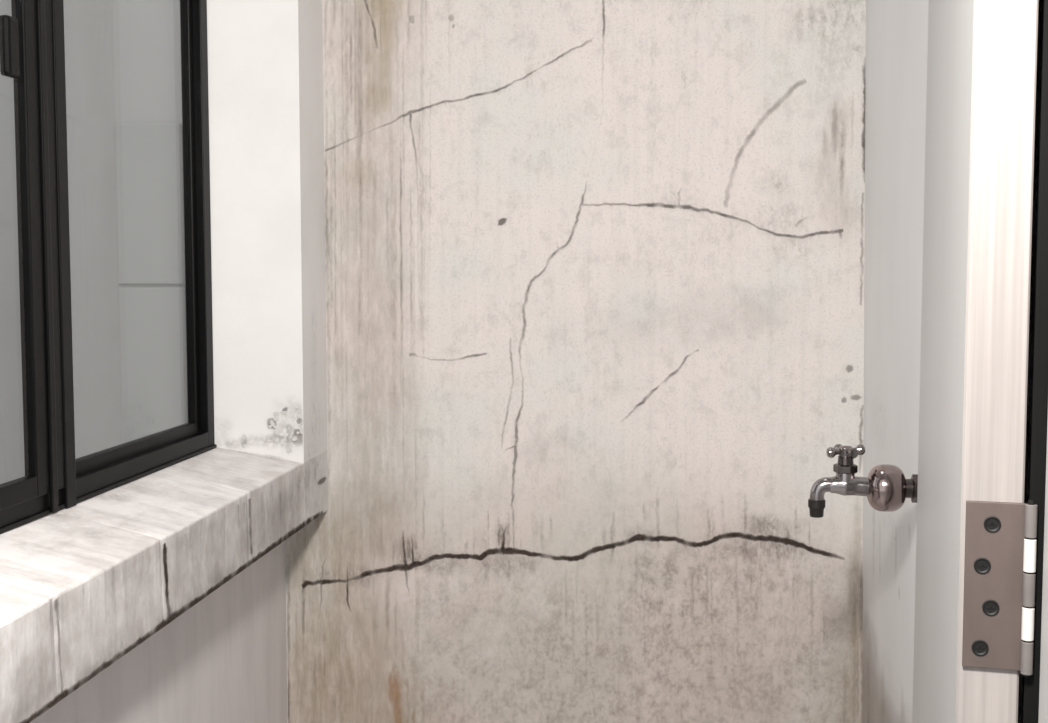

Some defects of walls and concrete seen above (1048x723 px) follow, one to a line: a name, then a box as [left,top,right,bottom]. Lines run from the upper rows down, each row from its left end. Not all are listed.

crack [404,73,531,142]
crack [523,196,583,334]
crack [631,203,734,218]
crack [766,230,843,238]
crack [512,407,522,501]
crack [302,532,837,606]
crack [21,499,323,723]